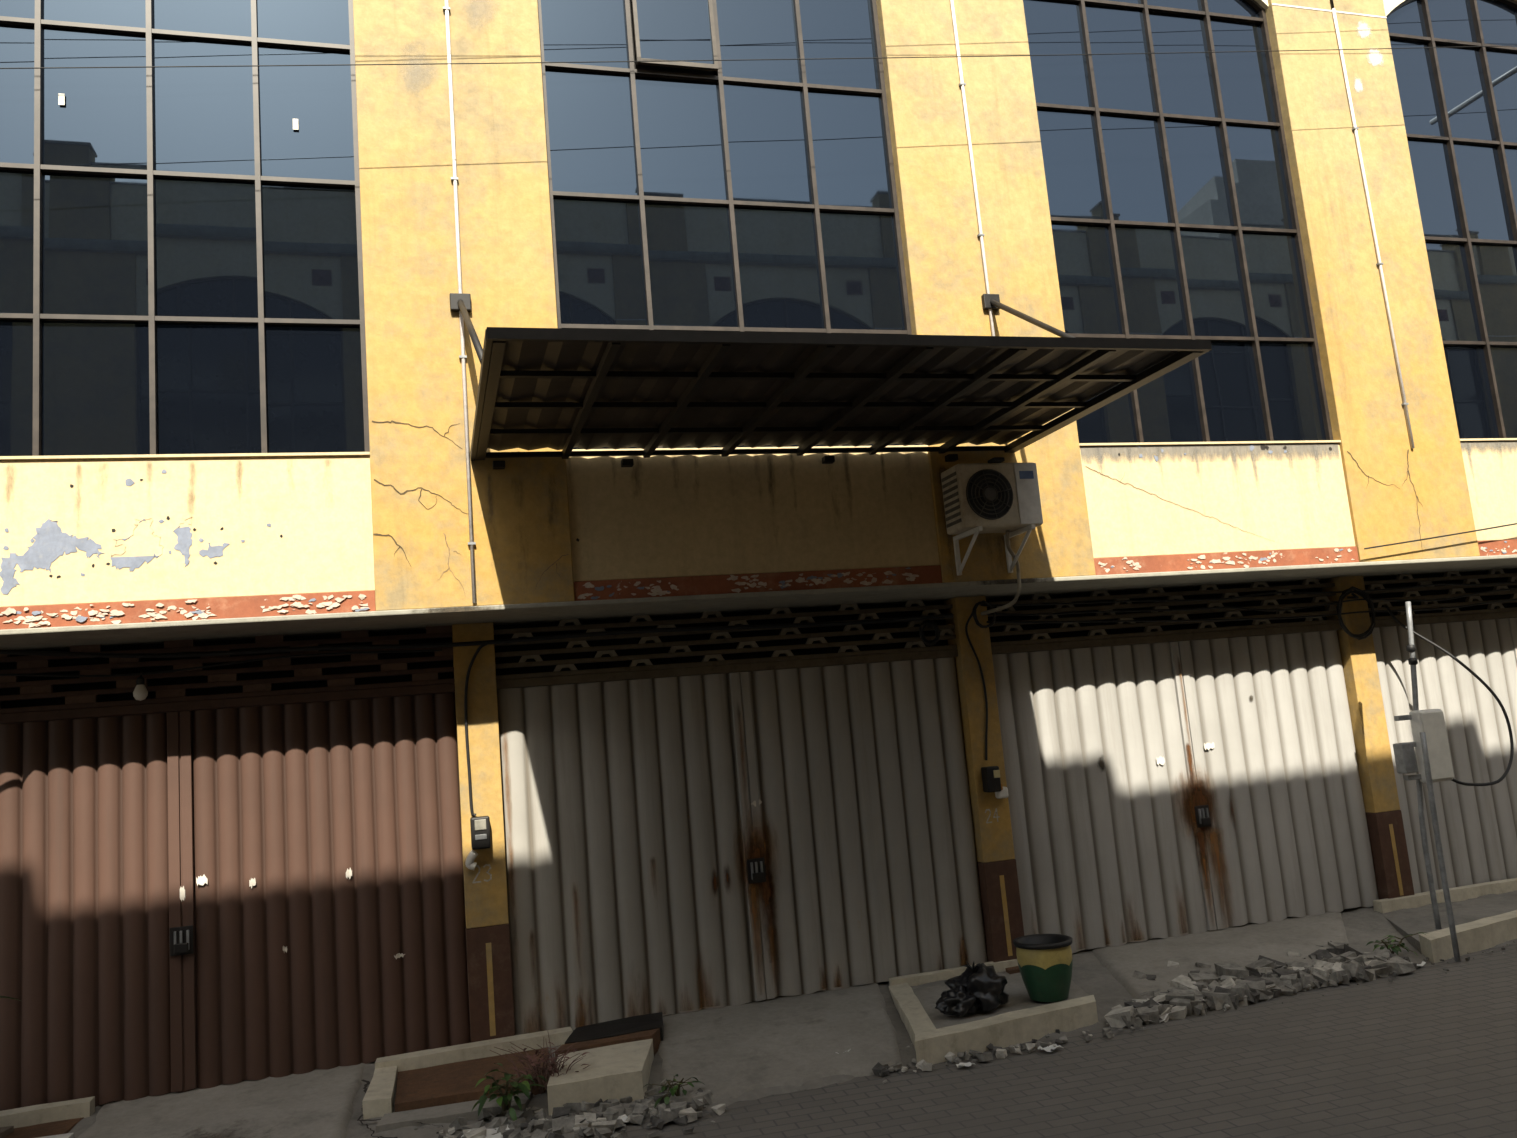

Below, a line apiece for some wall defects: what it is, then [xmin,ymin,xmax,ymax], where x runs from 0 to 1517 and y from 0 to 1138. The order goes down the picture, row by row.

crack [372,421,462,449]
crack [1347,449,1423,551]
crack [373,479,467,593]
peeling [0,516,245,628]
peeling [578,580,679,599]
peeling [727,567,919,593]
peeling [1098,557,1141,572]
peeling [1187,553,1276,569]
peeling [261,594,370,614]
corrosion [1182,744,1235,910]
corrosion [712,828,776,975]